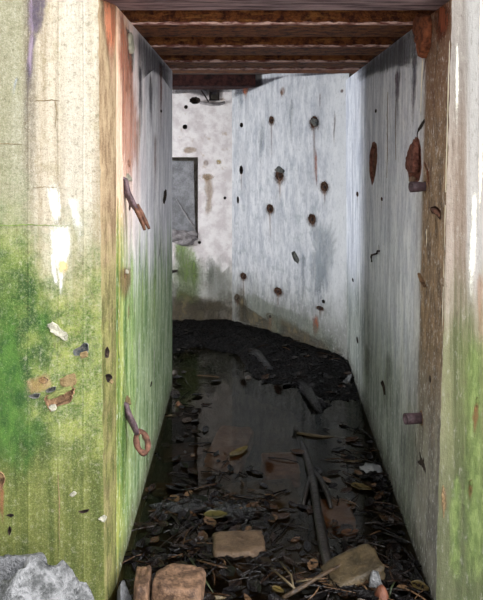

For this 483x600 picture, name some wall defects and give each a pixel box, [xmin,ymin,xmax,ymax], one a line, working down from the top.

rust [412,5,449,78]
damp [445,42,459,192]
damp [48,186,70,288]
damp [69,200,80,227]
damp [172,292,231,321]
damp [239,292,330,351]
spalling [28,373,77,412]